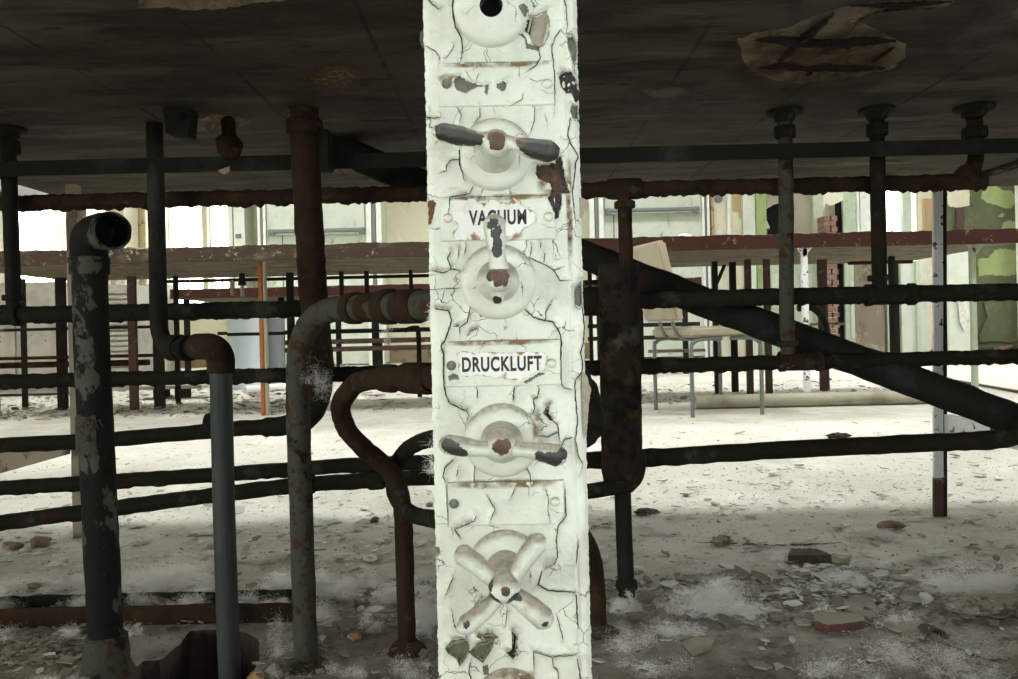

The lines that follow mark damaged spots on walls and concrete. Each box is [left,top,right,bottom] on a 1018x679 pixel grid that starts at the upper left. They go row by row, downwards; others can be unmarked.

spalling [138,0,284,10]
peeling [517,3,550,50]
peeling [567,34,577,63]
peeling [454,76,507,95]
crack [530,242,564,281]
peeling [574,282,582,310]
crack [430,245,478,419]
crack [513,304,585,467]
peeling [581,370,591,438]
crack [442,460,581,679]
peeling [445,633,499,676]
peeling [507,633,517,658]